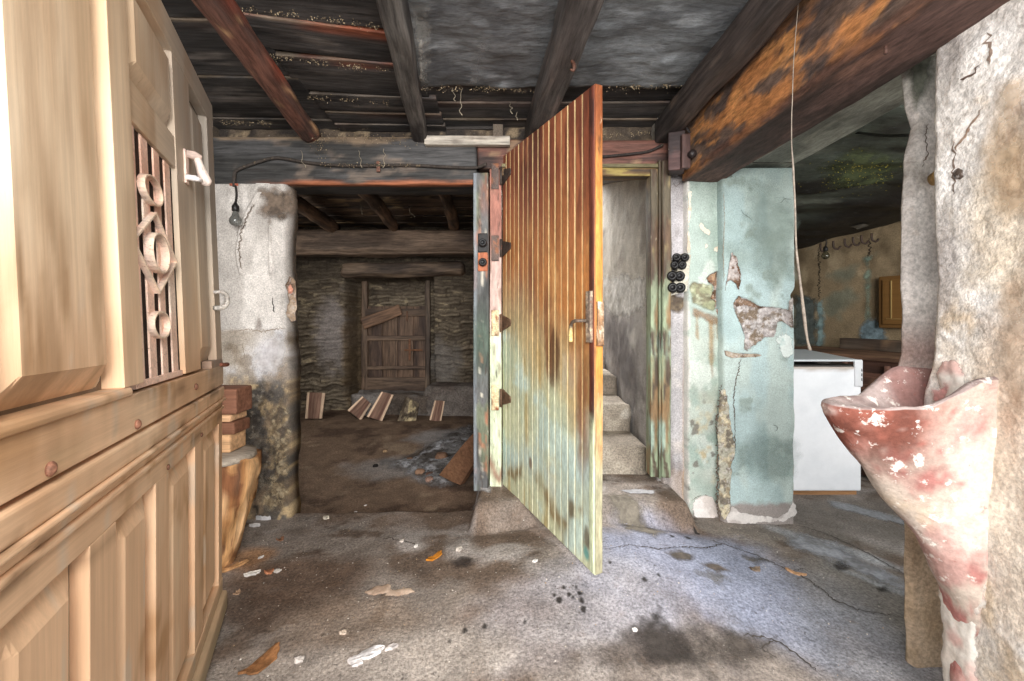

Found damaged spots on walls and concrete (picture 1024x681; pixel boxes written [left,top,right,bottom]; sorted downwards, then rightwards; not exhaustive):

crack [960,32,993,80]
crack [922,109,981,192]
spalling [707,253,794,358]
leakage [245,380,269,491]
spalling [691,389,797,524]
crack [608,360,902,618]
leakage [644,615,703,664]
crack [745,633,818,672]